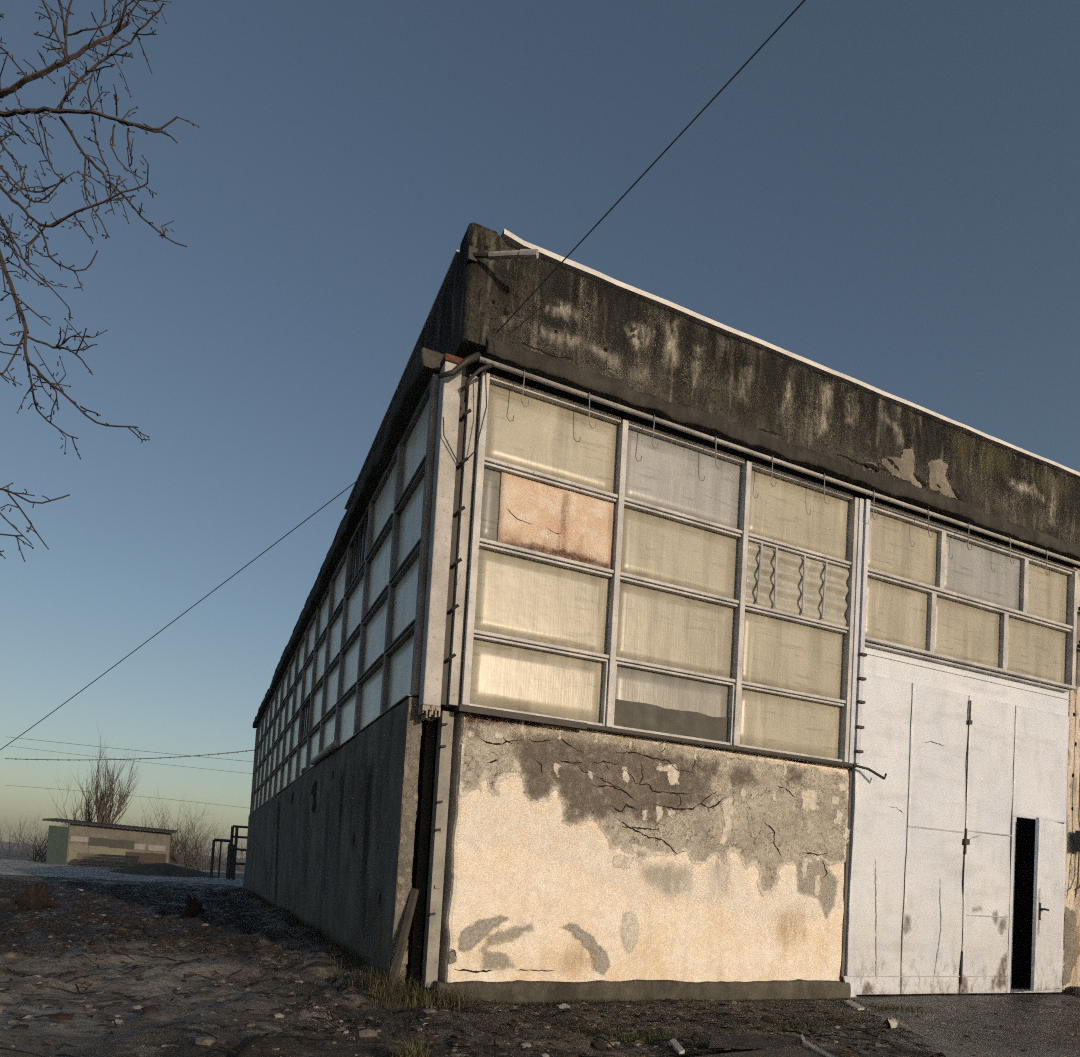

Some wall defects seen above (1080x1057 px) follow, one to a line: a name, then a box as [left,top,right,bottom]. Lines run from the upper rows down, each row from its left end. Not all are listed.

spalling [864,448,965,502]
corrosion [527,546,596,563]
crack [482,738,727,854]
peeling [459,713,851,917]
crack [766,824,828,877]
peeling [449,915,531,969]
peeling [563,923,610,974]